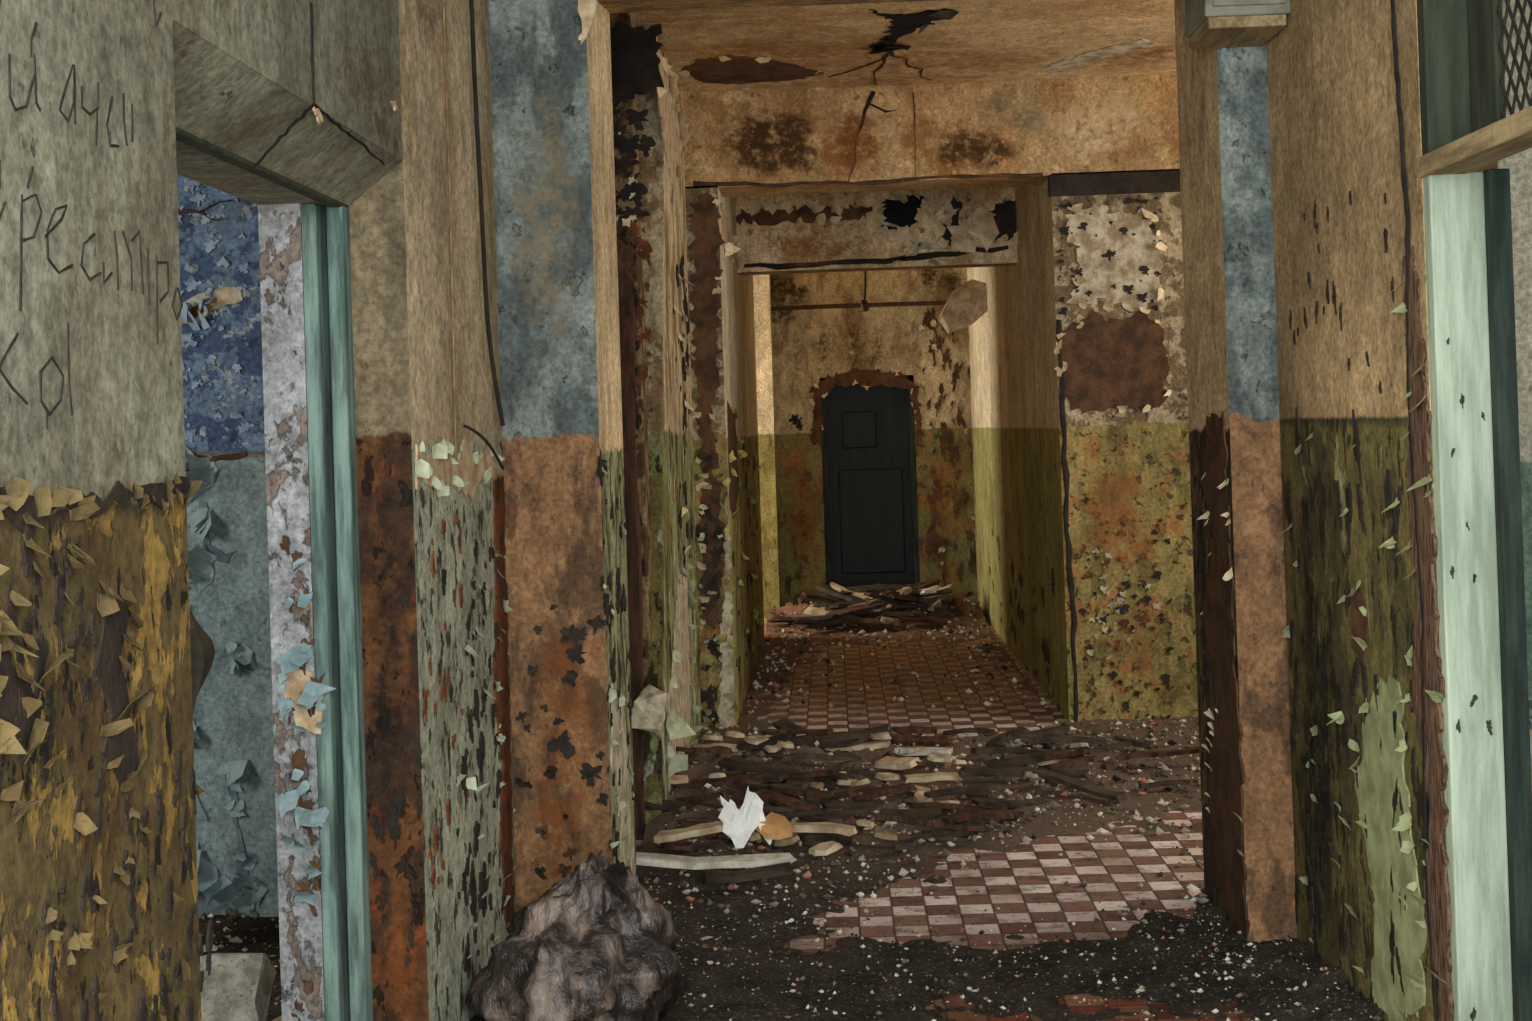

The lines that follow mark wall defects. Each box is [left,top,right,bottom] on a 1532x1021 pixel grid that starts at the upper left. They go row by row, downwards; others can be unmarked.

peeling [178,180,255,433]
spalling [578,0,597,45]
spalling [610,22,824,396]
leakage [732,116,854,175]
leakage [943,131,1010,164]
spalling [1054,197,1172,414]
spalling [456,535,637,880]
peeling [666,190,1018,800]
peeling [1069,497,1175,720]
spalling [1194,411,1250,936]
peeling [1282,228,1478,1021]
peeling [456,821,511,982]